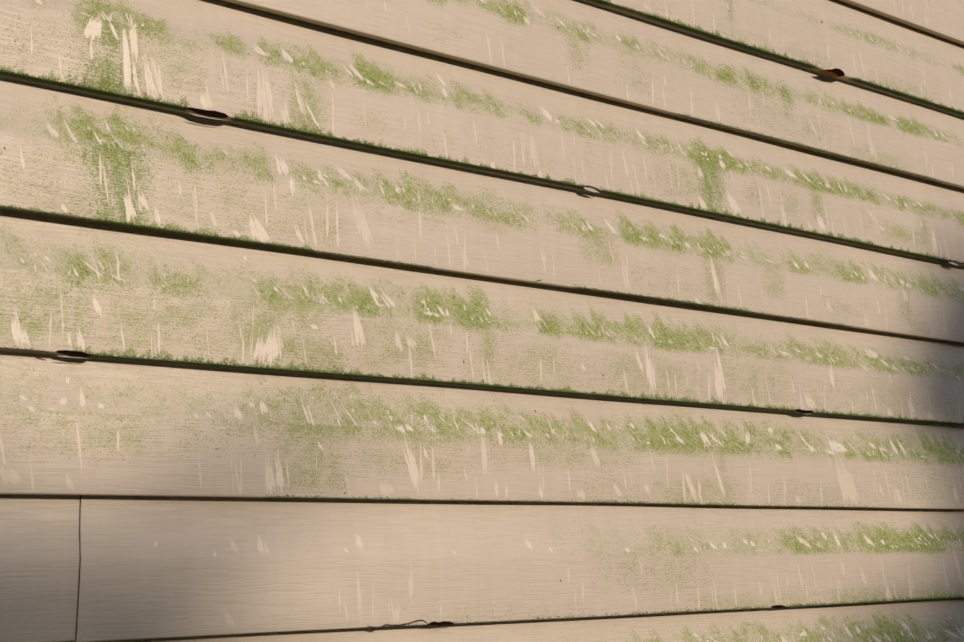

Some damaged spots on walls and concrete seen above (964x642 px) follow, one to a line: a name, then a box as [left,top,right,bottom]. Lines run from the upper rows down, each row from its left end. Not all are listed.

water stain [80,10,164,100]
water stain [246,44,320,129]
water stain [87,120,135,204]
water stain [124,161,161,227]
water stain [233,153,373,248]
water stain [49,252,127,351]
water stain [239,278,396,368]
water stain [635,326,732,403]
water stain [630,227,774,307]
water stain [332,393,669,502]
water stain [697,425,789,501]
water stain [800,435,927,506]